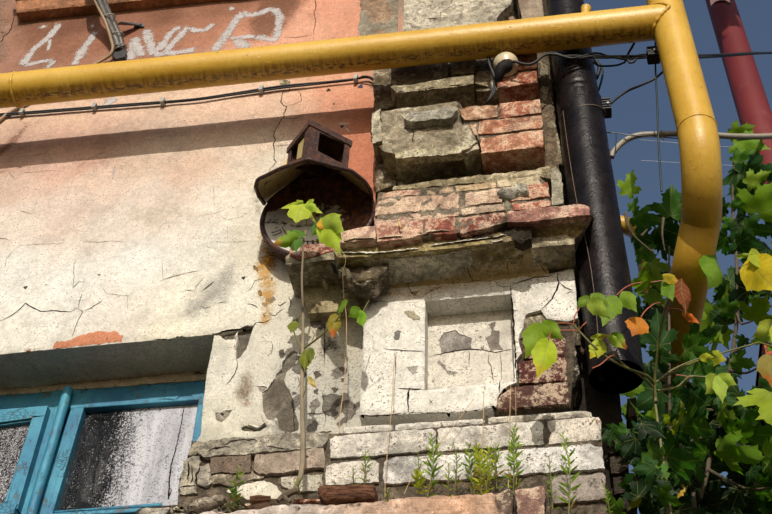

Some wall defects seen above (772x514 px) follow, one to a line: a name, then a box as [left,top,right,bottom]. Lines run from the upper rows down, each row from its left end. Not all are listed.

peeling [357,0,399,36]
crack [270,81,302,169]
crack [1,242,135,336]
peeling [53,331,123,348]
flaking render [212,322,256,359]
peeling [310,320,326,330]
crack [360,262,574,418]
peeling [437,322,503,374]
peeling [215,409,232,422]
flaking render [242,349,358,434]